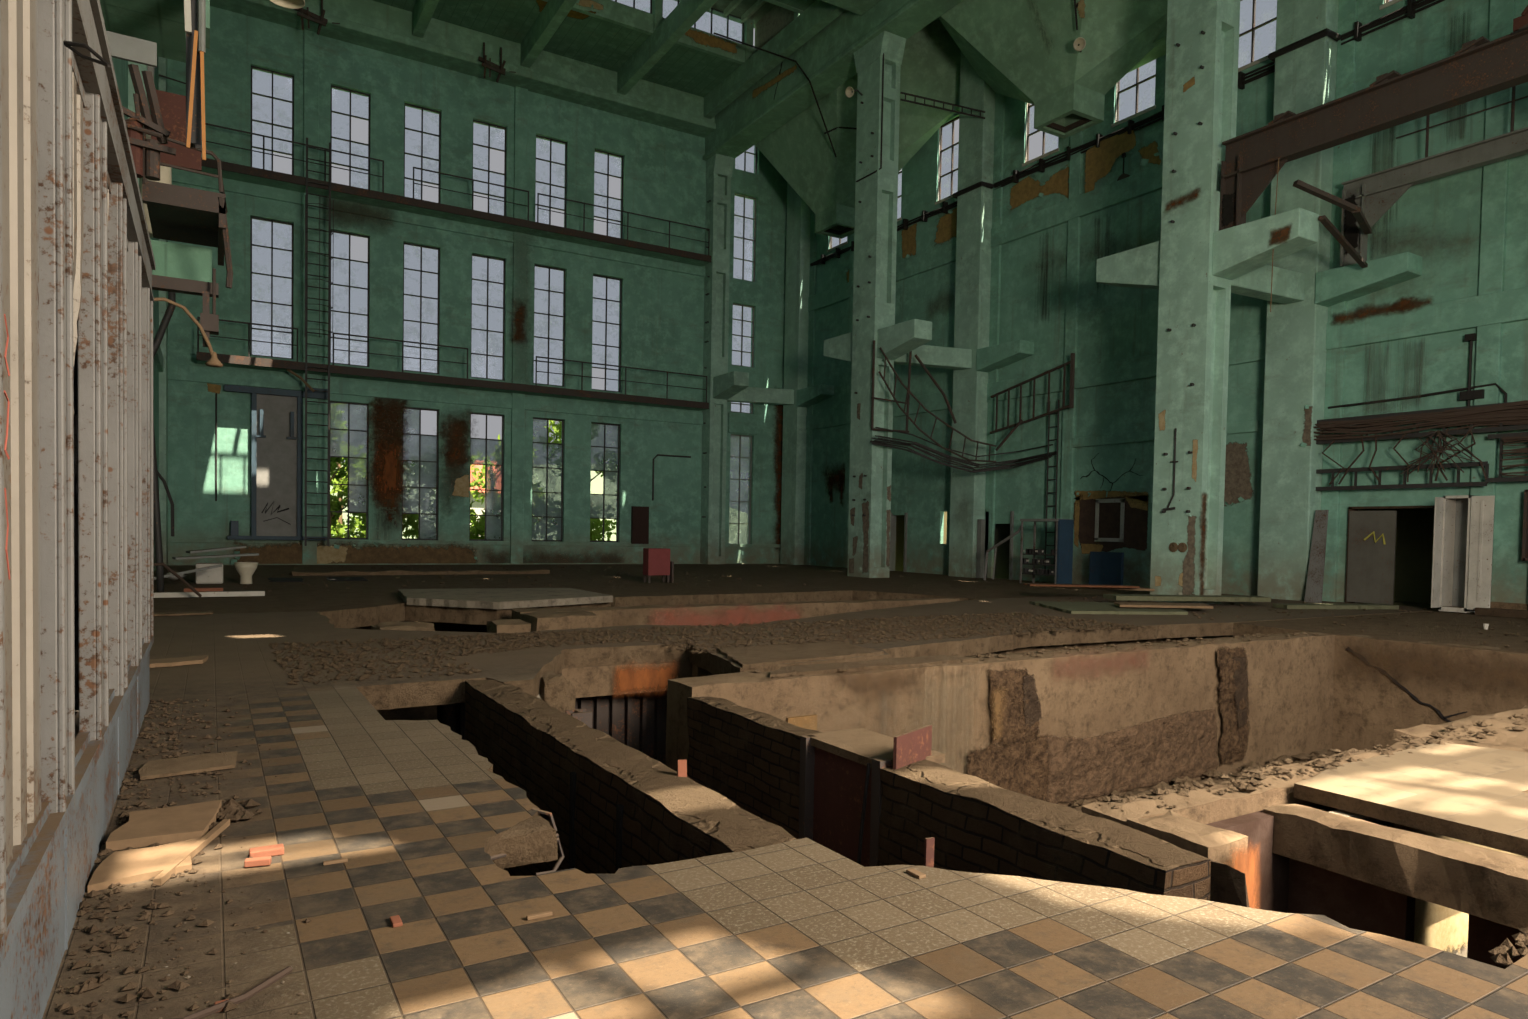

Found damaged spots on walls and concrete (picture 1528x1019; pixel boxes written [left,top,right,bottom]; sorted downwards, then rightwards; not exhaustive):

peeling [1006,130,1161,212]
corrosion [1333,297,1431,324]
crack [1347,647,1467,722]